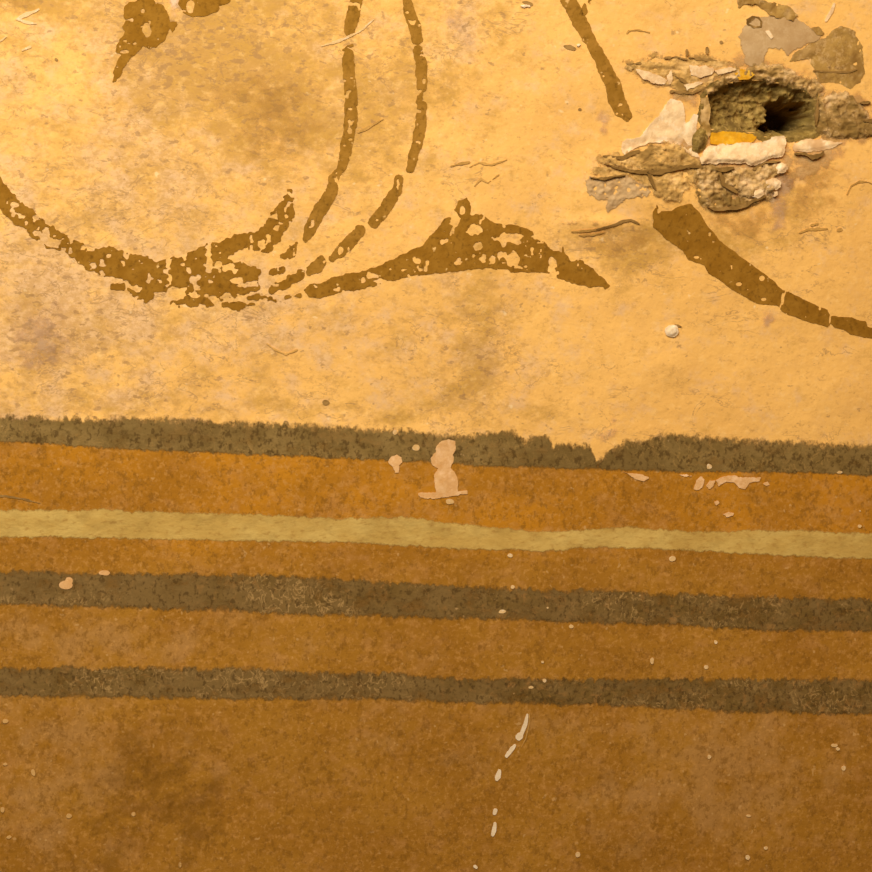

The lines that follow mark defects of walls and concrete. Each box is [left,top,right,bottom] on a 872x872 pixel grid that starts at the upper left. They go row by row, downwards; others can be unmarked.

spalling [586,0,872,213]
peeling [418,439,468,504]
peeling [681,464,769,490]